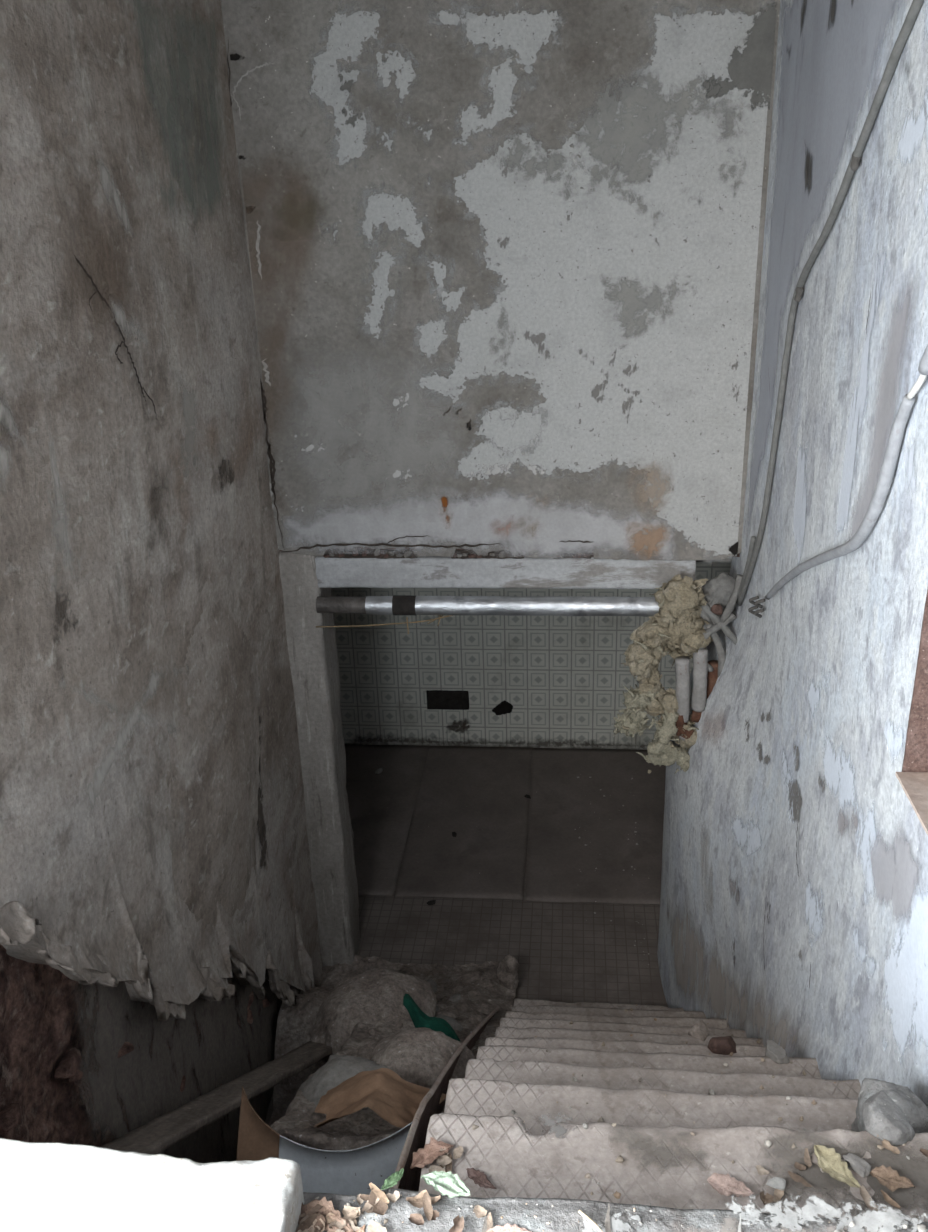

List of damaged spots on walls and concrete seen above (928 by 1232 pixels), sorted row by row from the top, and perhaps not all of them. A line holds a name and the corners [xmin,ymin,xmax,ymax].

peeling [309,8,433,168]
peeling [897,92,928,162]
crack [74,255,157,420]
peeling [358,0,901,557]
crack [260,379,499,553]
spalling [323,549,418,559]
spalling [451,549,524,559]
spalling [553,549,592,559]